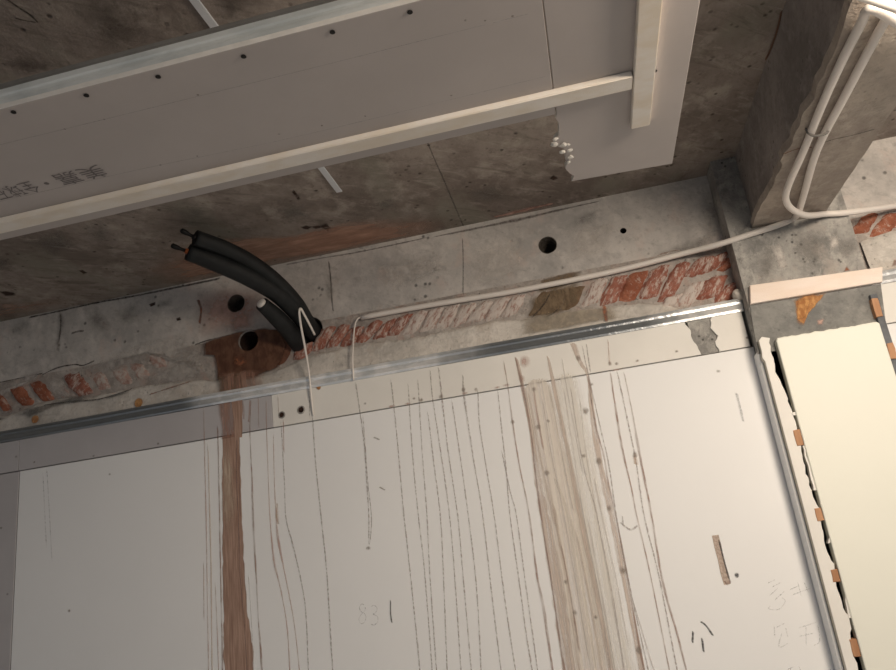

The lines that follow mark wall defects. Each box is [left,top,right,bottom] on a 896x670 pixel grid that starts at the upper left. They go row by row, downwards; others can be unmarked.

spalling [550,137,574,164]
flaking render [279,250,737,365]
leakage [410,376,478,604]
leakage [515,343,652,670]
leakage [609,362,684,668]